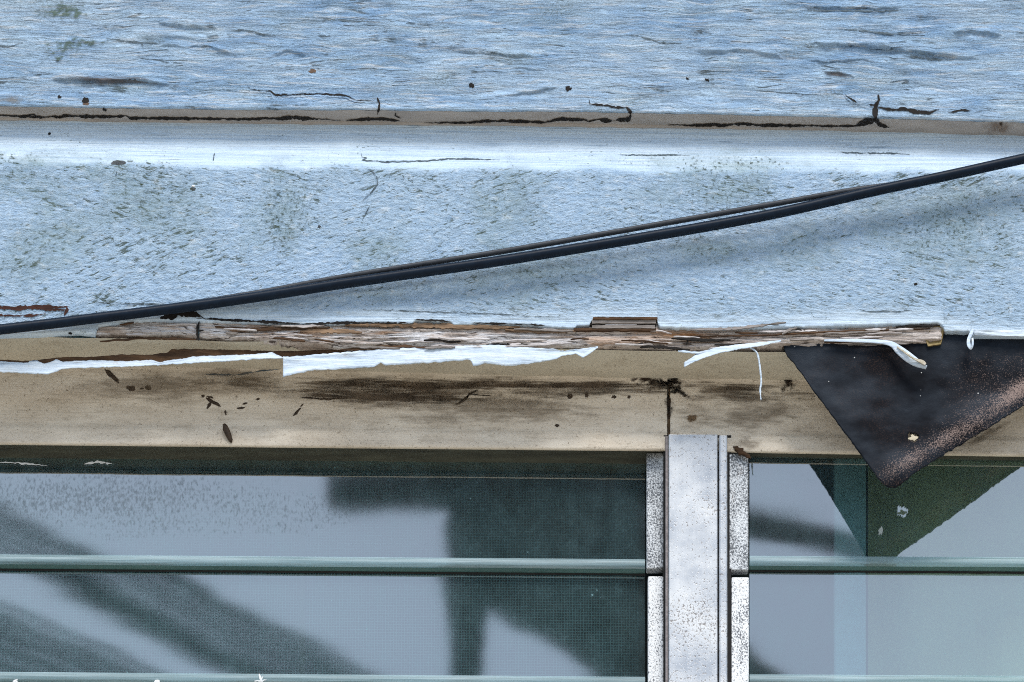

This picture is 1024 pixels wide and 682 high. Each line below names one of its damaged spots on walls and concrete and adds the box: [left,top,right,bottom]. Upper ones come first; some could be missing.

crack [0,85,632,124]
peeling [0,345,598,377]
peeling [824,339,927,369]
leakage [302,379,619,403]
leakage [632,378,691,418]
crack [665,389,673,435]